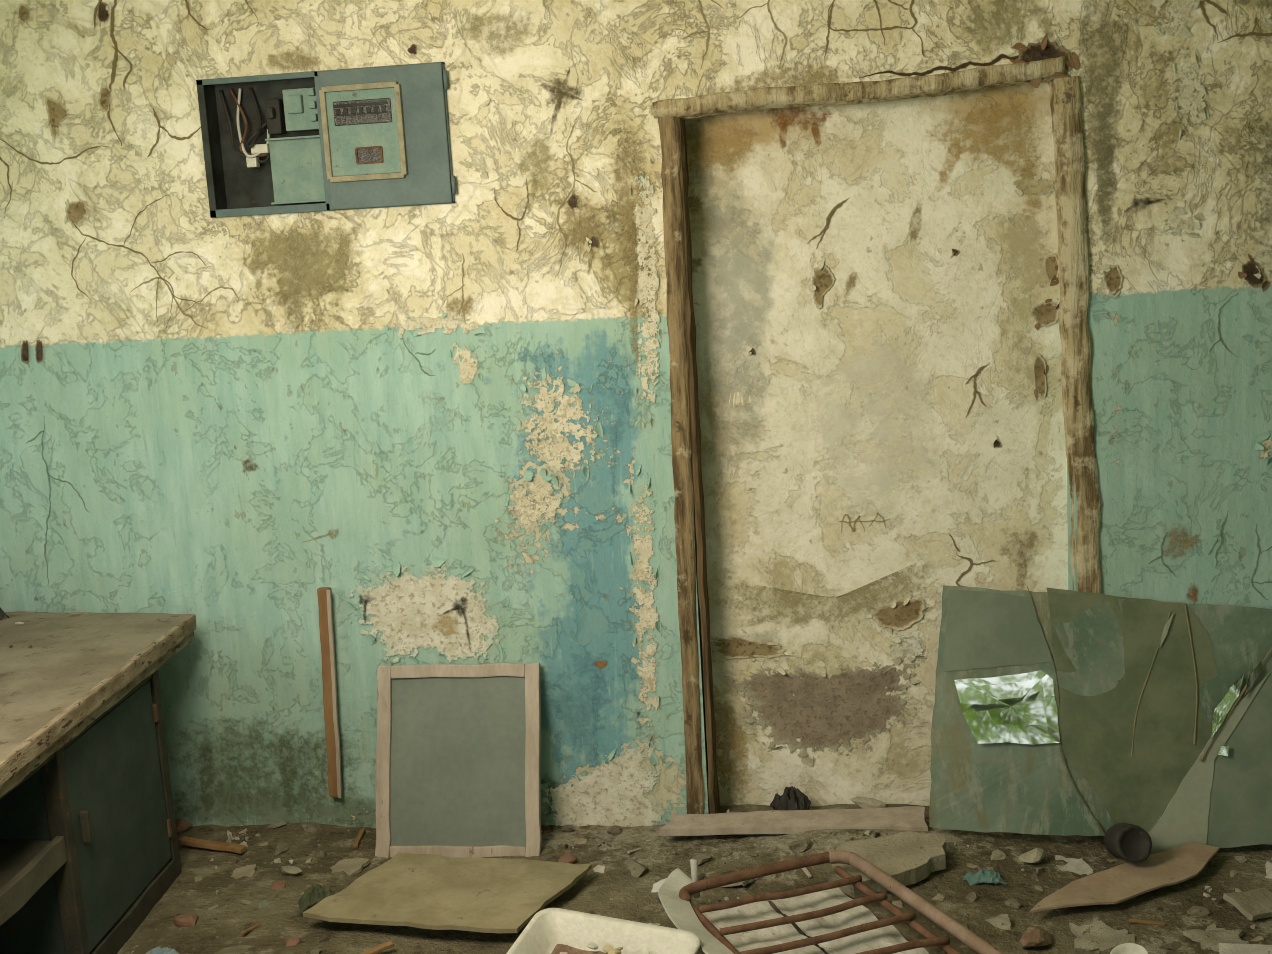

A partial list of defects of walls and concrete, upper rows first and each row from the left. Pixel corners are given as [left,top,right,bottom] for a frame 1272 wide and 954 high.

crack [824,0,1031,84]
crack [1200,0,1272,43]
crack [0,0,201,218]
water stain [1083,9,1163,242]
crack [65,195,238,328]
crack [494,178,529,253]
crack [555,118,596,277]
spalling [1238,250,1272,292]
peeling [503,367,606,535]
peeling [345,556,513,665]
peeling [540,465,672,827]
water stain [187,722,328,811]